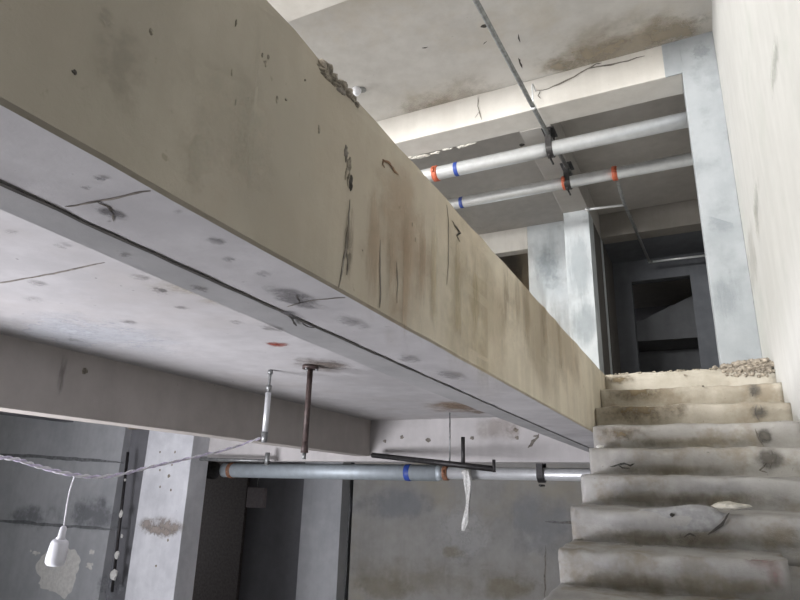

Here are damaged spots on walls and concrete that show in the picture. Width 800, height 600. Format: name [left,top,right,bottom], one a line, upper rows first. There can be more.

spalling [317,58,360,108]
crack [537,56,643,98]
crack [382,159,399,175]
crack [0,182,589,448]
corrosion [309,361,341,371]
crack [610,462,634,470]
damp [141,519,180,536]